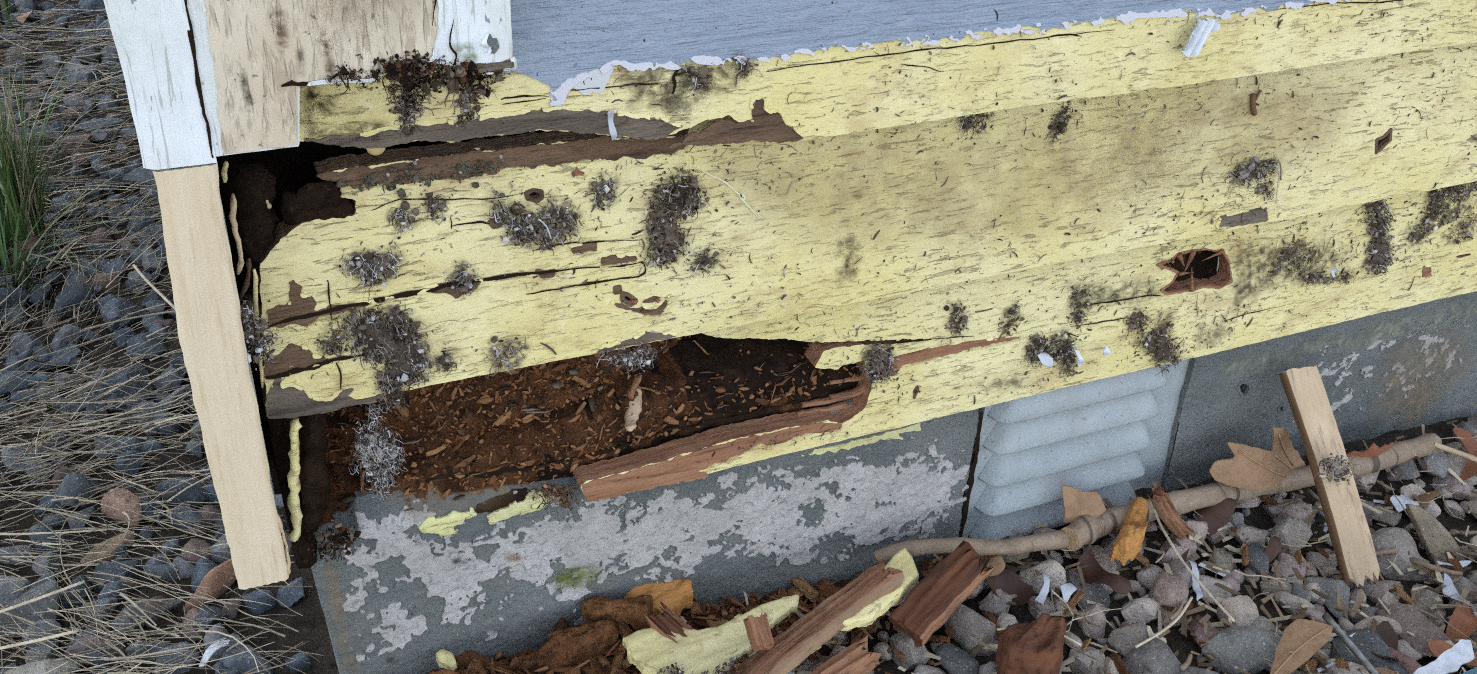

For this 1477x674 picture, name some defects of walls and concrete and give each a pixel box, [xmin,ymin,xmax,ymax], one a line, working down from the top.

crack [184,0,214,158]
peeling [264,280,395,419]
peeling [416,276,483,299]
damp [1236,246,1337,305]
peeling [342,422,970,662]